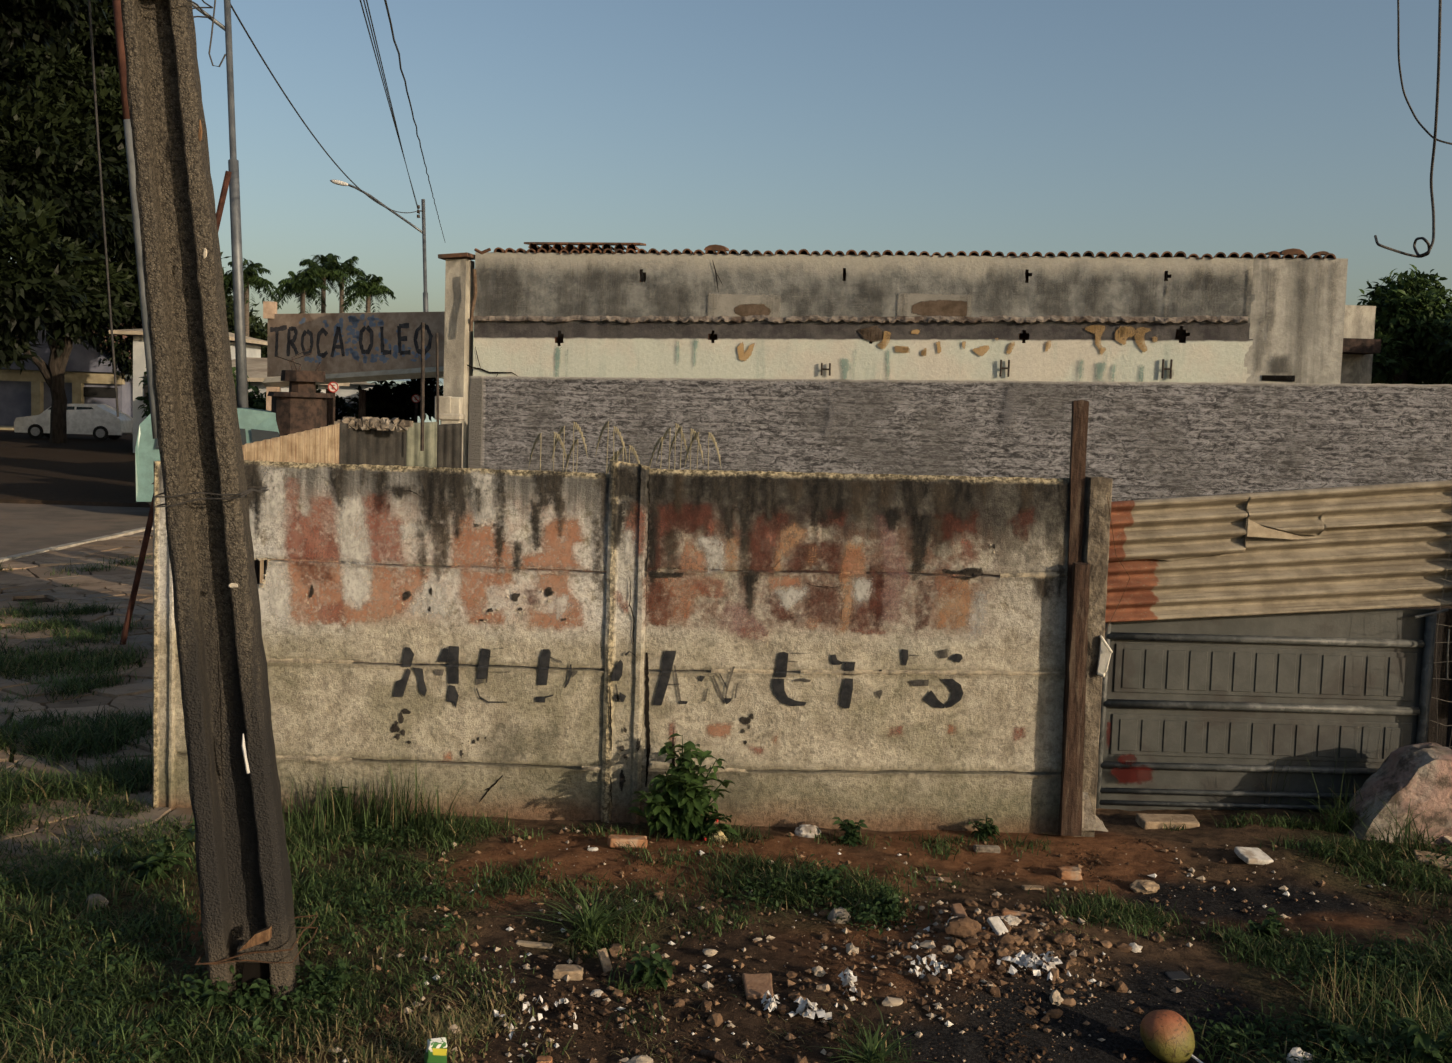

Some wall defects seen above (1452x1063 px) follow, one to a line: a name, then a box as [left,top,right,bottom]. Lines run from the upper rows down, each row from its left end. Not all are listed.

leakage [244,462,262,537]
peeling [254,467,583,630]
leakage [330,465,565,579]
leakage [593,466,989,614]
leakage [1018,481,1070,519]
leakage [1034,544,1065,599]